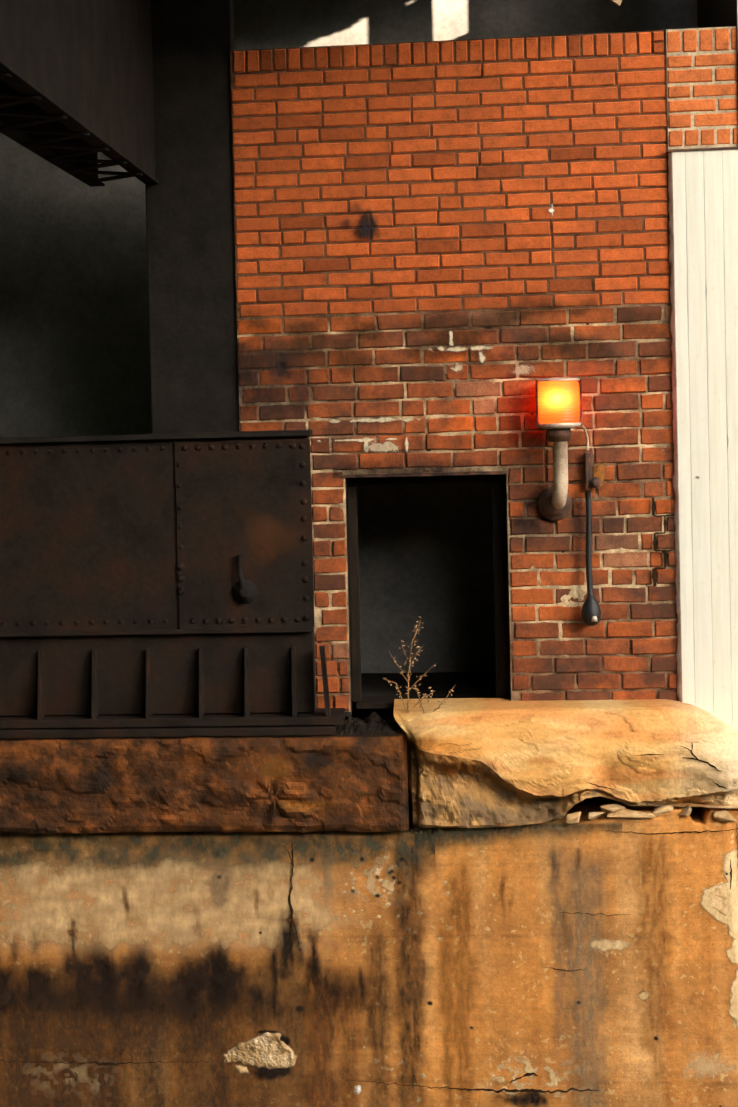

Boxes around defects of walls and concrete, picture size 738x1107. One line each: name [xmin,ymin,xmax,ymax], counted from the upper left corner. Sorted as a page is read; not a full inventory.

spalling [224,1030,297,1079]
crack [272,840,301,1007]
water stain [0,823,622,1107]
corrosion [442,868,473,1105]
crack [352,1032,601,1107]
corrosion [638,843,666,1030]
peeling [701,849,738,1029]